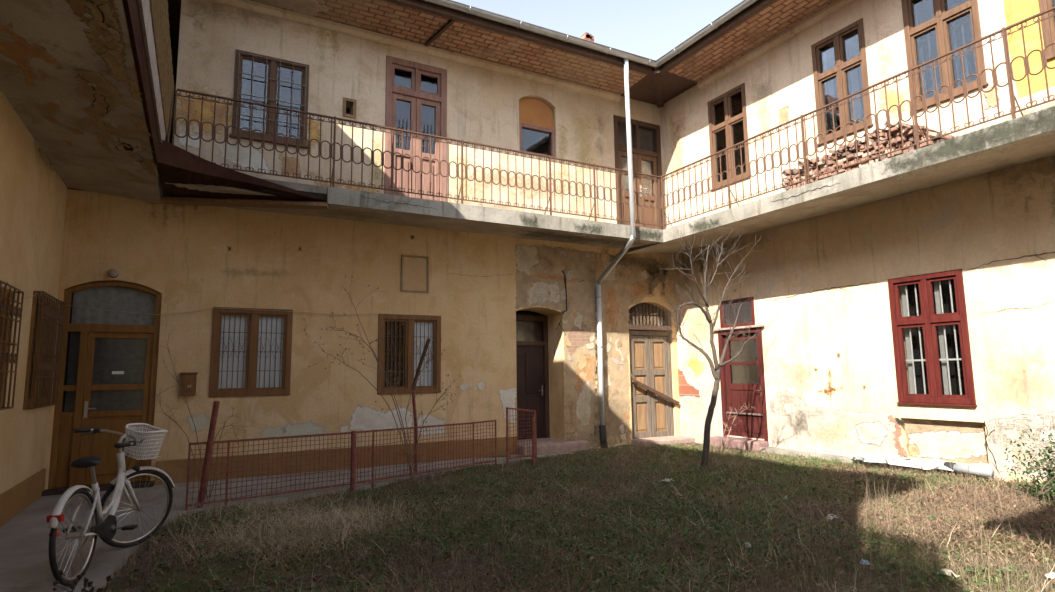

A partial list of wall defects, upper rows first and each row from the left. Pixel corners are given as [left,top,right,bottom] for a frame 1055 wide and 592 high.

peeling [0,13,72,86]
peeling [66,0,130,88]
peeling [979,0,1004,63]
peeling [983,86,1000,110]
water stain [885,106,1055,177]
crack [768,281,872,301]
crack [966,252,1055,271]
peeling [515,244,668,448]
peeling [257,404,447,441]
peeling [499,386,517,423]
flaking render [678,358,720,444]
flaking render [769,390,1055,481]